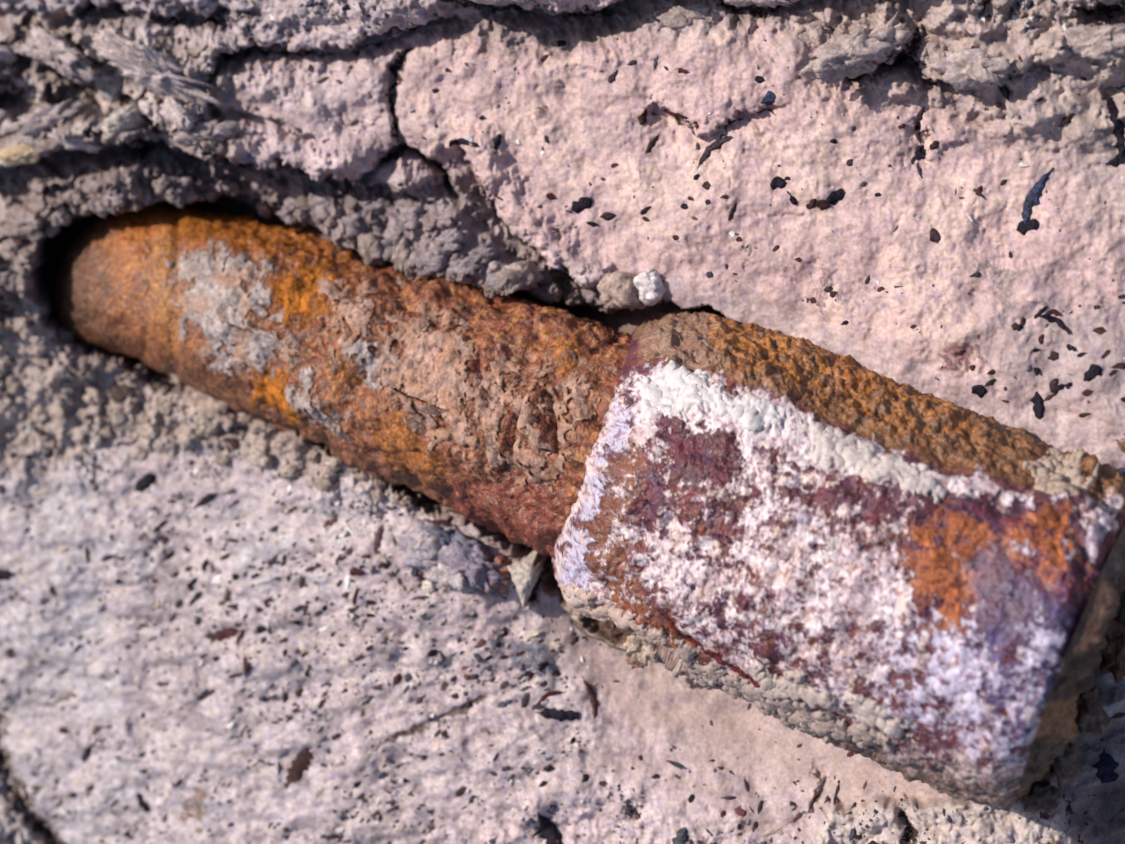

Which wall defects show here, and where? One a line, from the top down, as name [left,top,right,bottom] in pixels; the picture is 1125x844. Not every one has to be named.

crack [440,0,523,11]
crack [716,2,782,18]
crack [846,37,937,86]
crack [77,4,584,289]
corrosion [159,202,360,333]
spalling [6,375,23,395]
corrosion [247,361,310,436]
spalling [17,177,583,508]
corrosion [368,401,448,489]
peeling [414,338,1124,797]
corrosion [903,507,991,632]
corrosion [1026,500,1084,585]